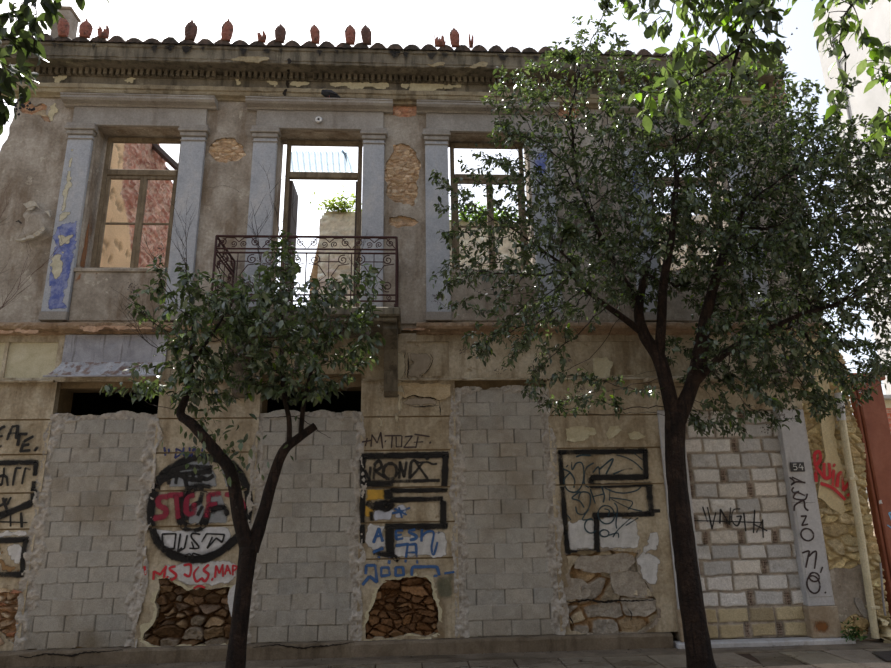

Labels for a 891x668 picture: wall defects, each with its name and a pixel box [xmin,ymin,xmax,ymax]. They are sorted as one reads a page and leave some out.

flaking render [209,138,246,163]
flaking render [384,144,421,206]
flaking render [80,325,152,333]
flaking render [398,382,451,406]
peeling [0,530,27,572]
peeling [568,517,660,584]
peeling [164,561,236,617]
flaking render [140,610,157,639]